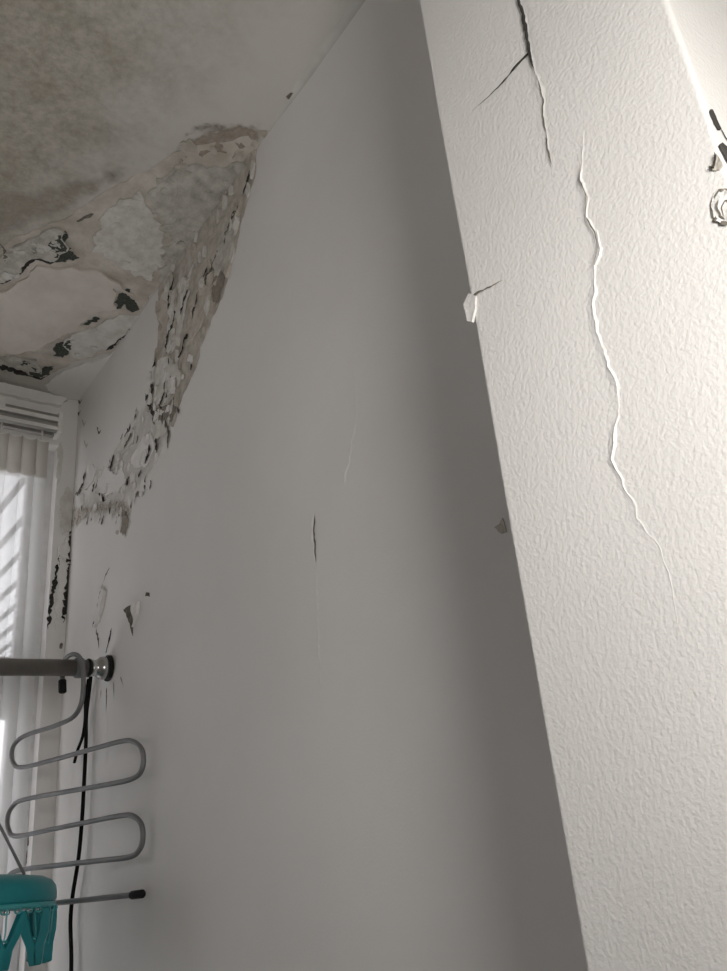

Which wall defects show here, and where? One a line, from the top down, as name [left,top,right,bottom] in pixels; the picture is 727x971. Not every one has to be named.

peeling [0,130,268,629]
crack [463,280,502,323]
crack [473,0,677,620]